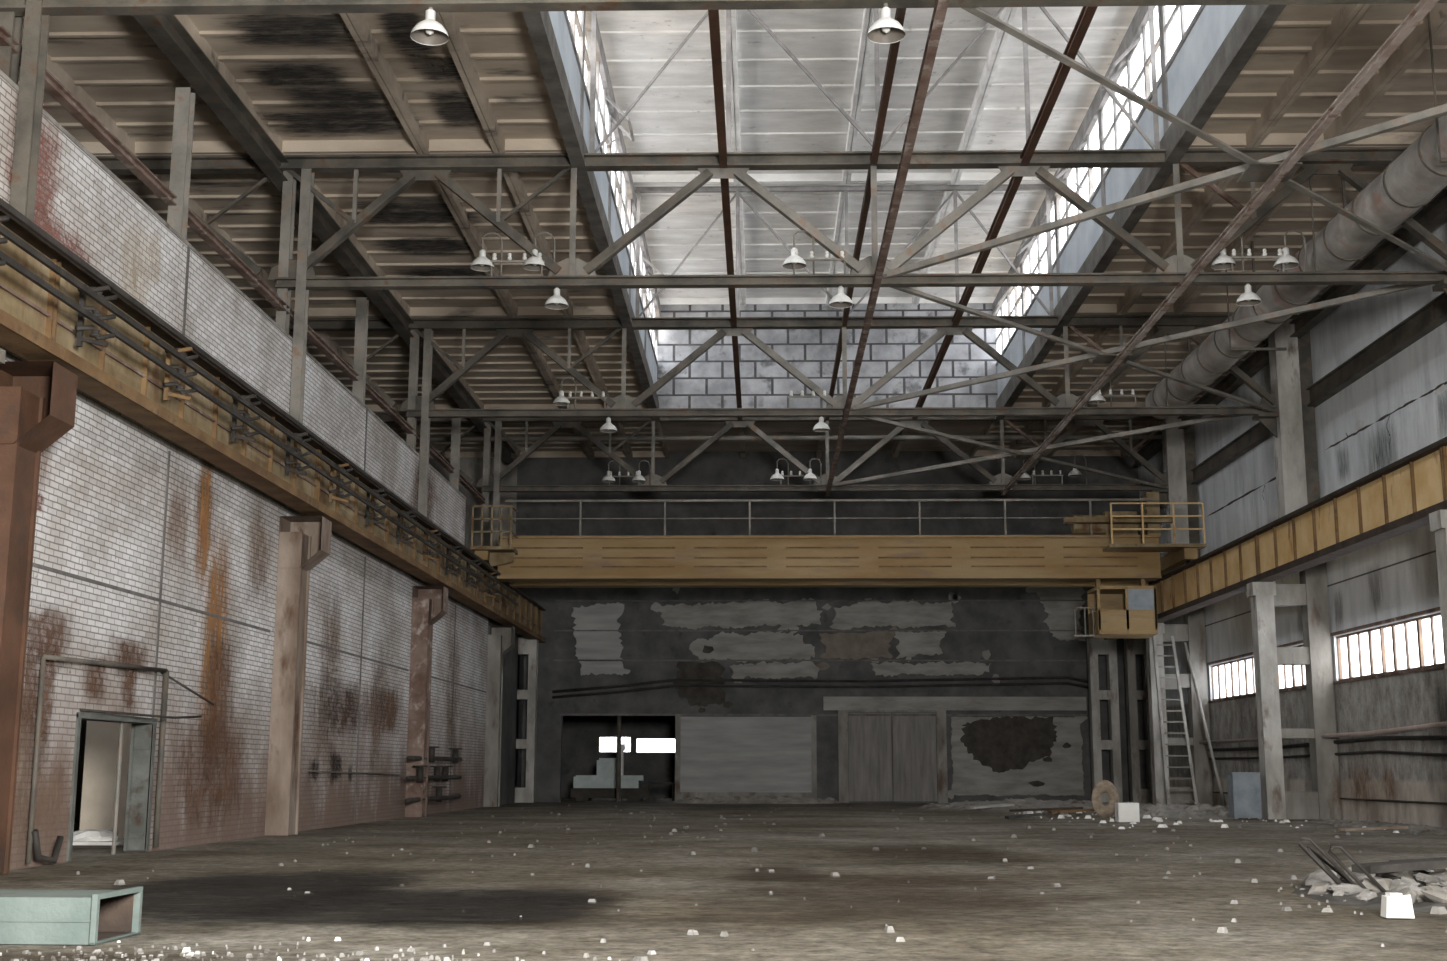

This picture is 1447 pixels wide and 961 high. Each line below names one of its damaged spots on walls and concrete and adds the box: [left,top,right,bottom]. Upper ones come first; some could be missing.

damp [226,14,355,46]
damp [247,63,416,136]
damp [379,13,480,126]
corrosion [181,463,243,819]
flaking render [571,602,630,676]
flaking render [651,588,1000,713]
flaking render [948,716,1088,799]